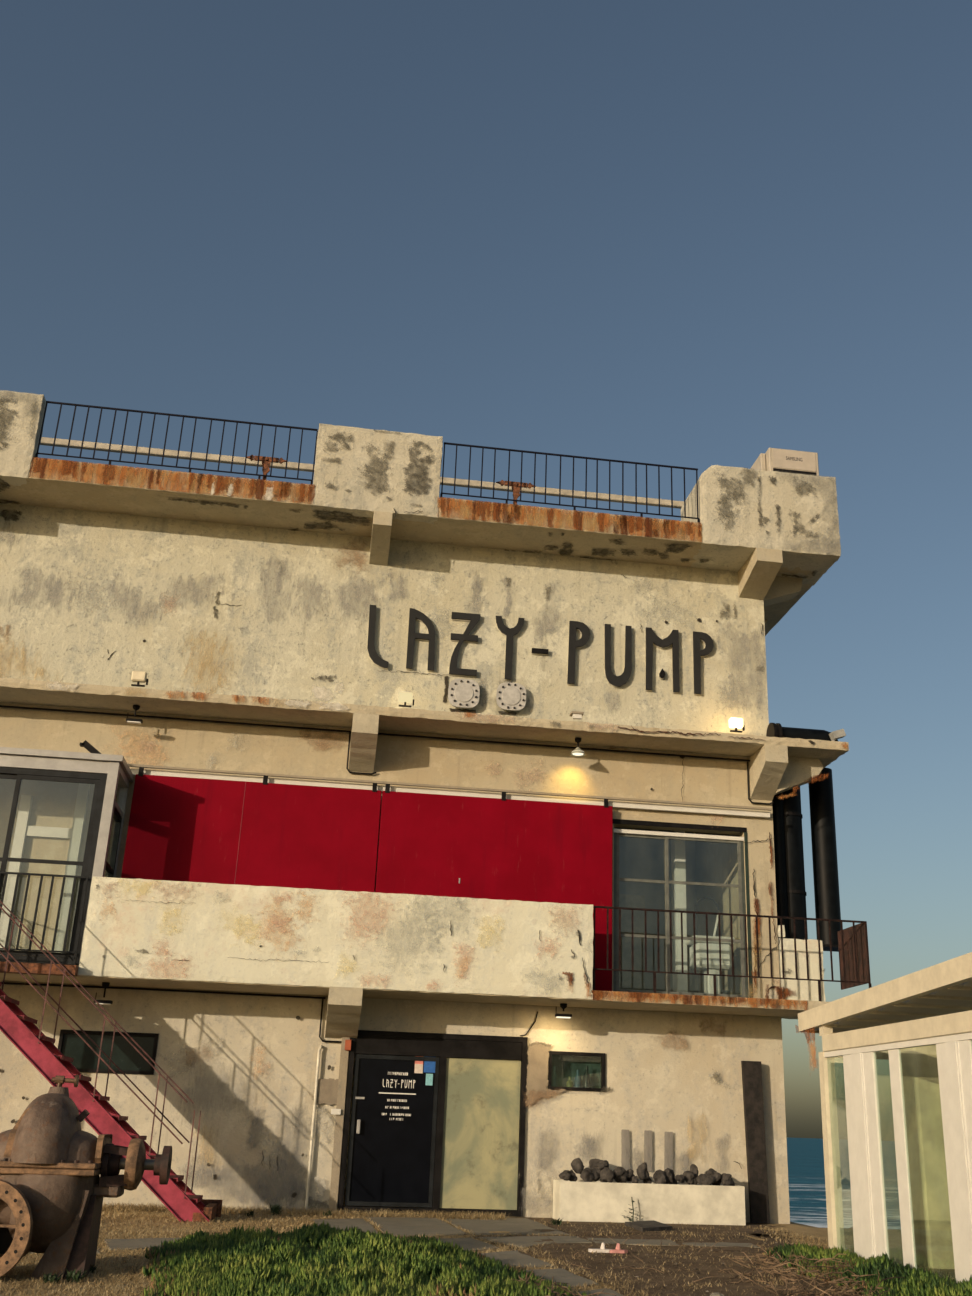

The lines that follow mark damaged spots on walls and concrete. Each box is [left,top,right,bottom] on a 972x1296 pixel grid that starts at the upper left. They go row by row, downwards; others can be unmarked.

corrosion [29,457,315,504]
corrosion [438,497,702,542]
corrosion [563,972,807,1010]